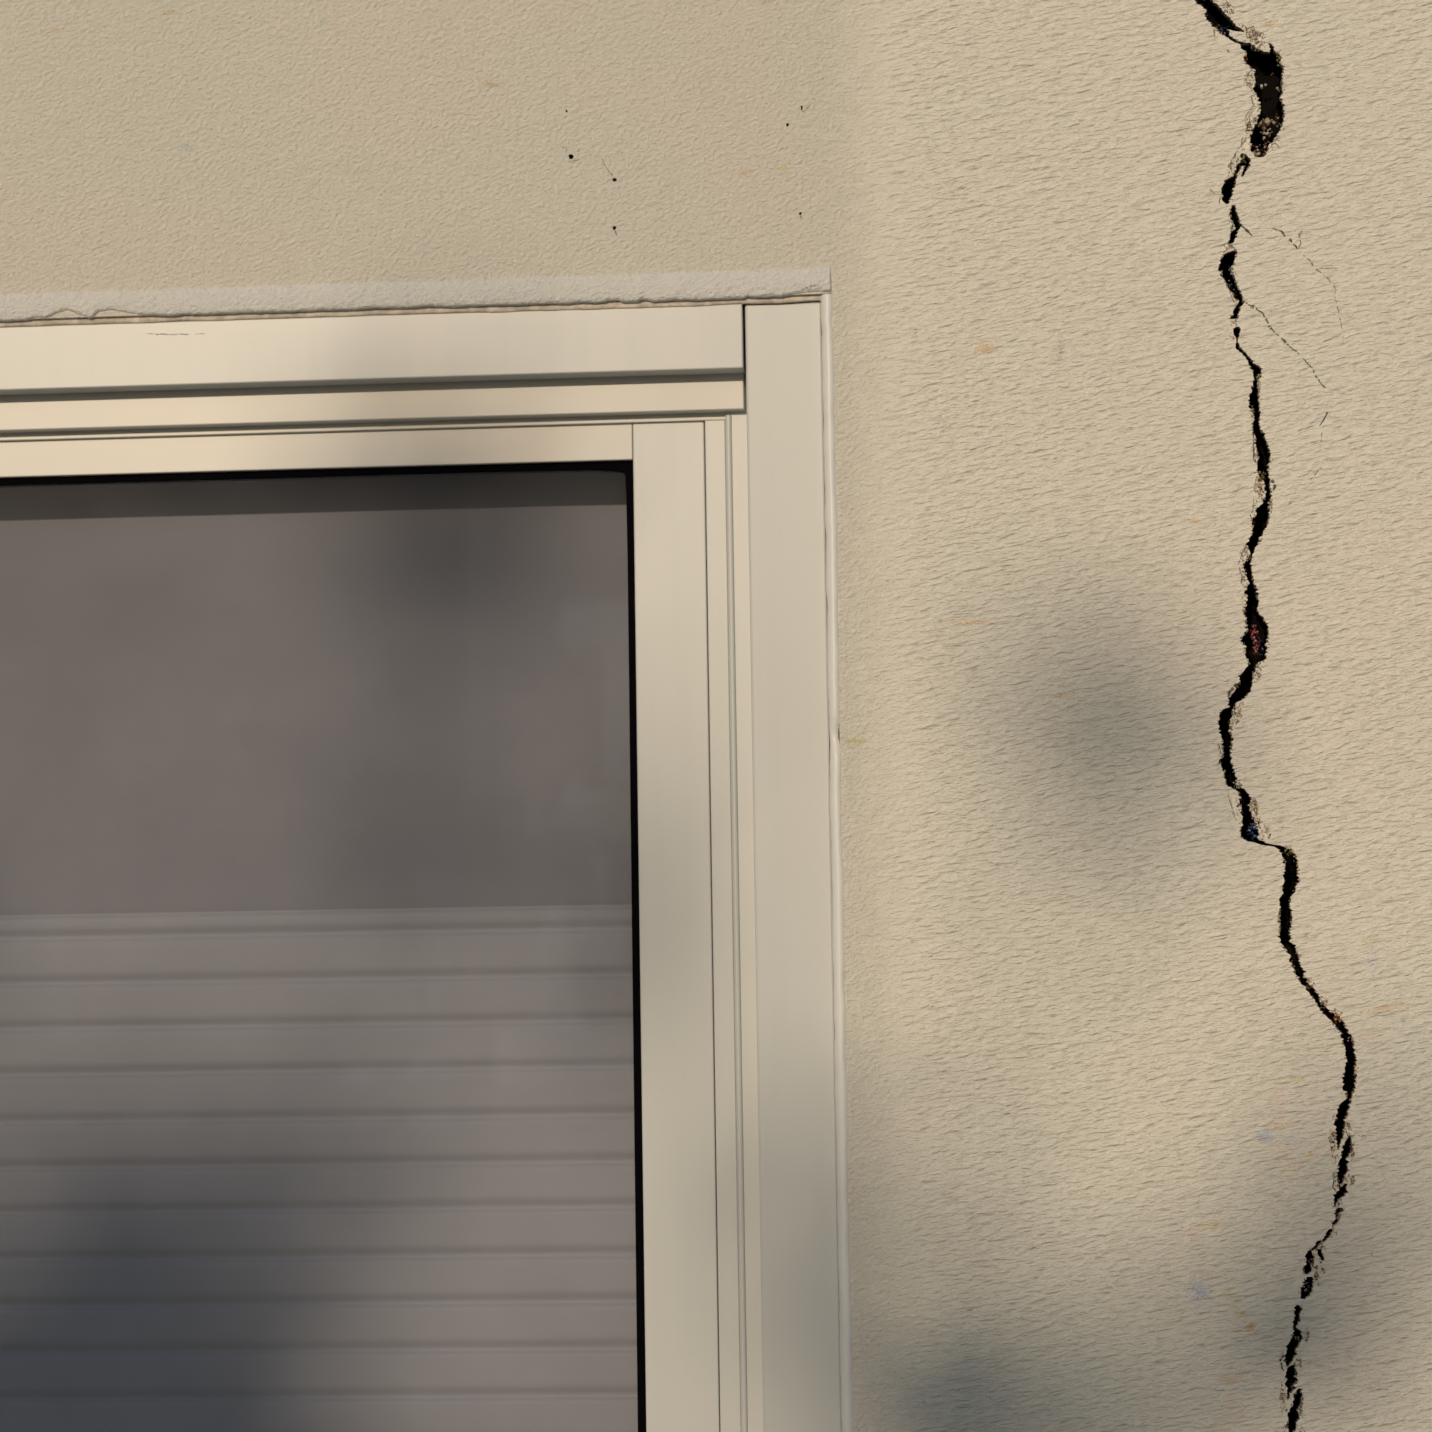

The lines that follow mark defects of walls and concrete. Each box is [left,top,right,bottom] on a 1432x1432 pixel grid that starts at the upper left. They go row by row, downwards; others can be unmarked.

crack [1195,0,1365,1432]